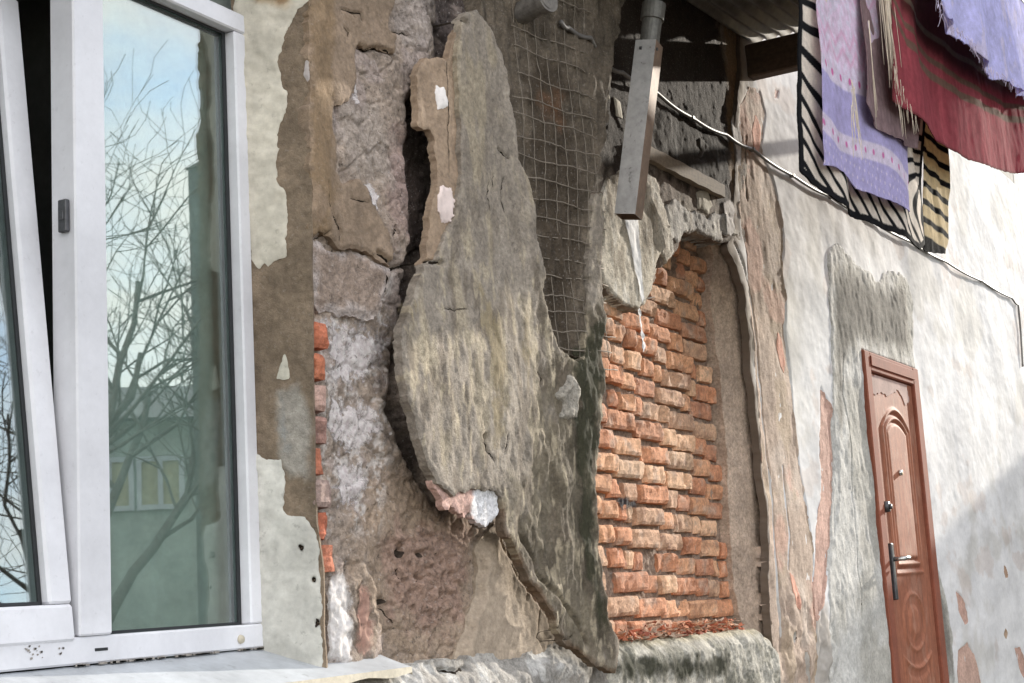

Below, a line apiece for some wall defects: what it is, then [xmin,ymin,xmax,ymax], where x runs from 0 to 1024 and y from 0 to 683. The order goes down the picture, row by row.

peeling [233,0,308,269]
flaking render [256,0,625,667]
spalling [595,237,745,642]
peeling [738,86,833,683]
peeling [956,592,968,624]
peeling [957,643,981,683]
peeling [1004,628,1024,677]